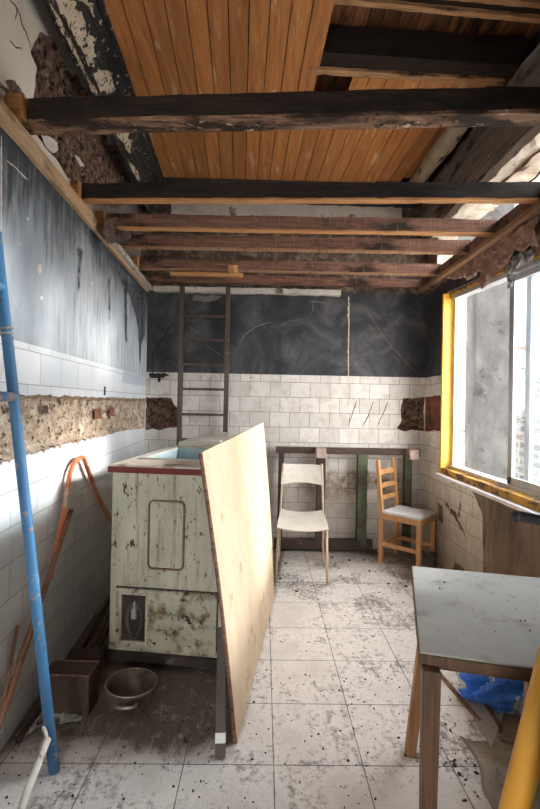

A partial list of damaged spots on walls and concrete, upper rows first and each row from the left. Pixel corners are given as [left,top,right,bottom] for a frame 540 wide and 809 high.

spalling [0,0,115,98]
spalling [37,133,140,184]
spalling [479,126,540,182]
spalling [443,203,478,219]
spalling [531,224,540,254]
spalling [0,401,14,465]
spalling [19,394,177,455]
spalling [397,395,441,432]